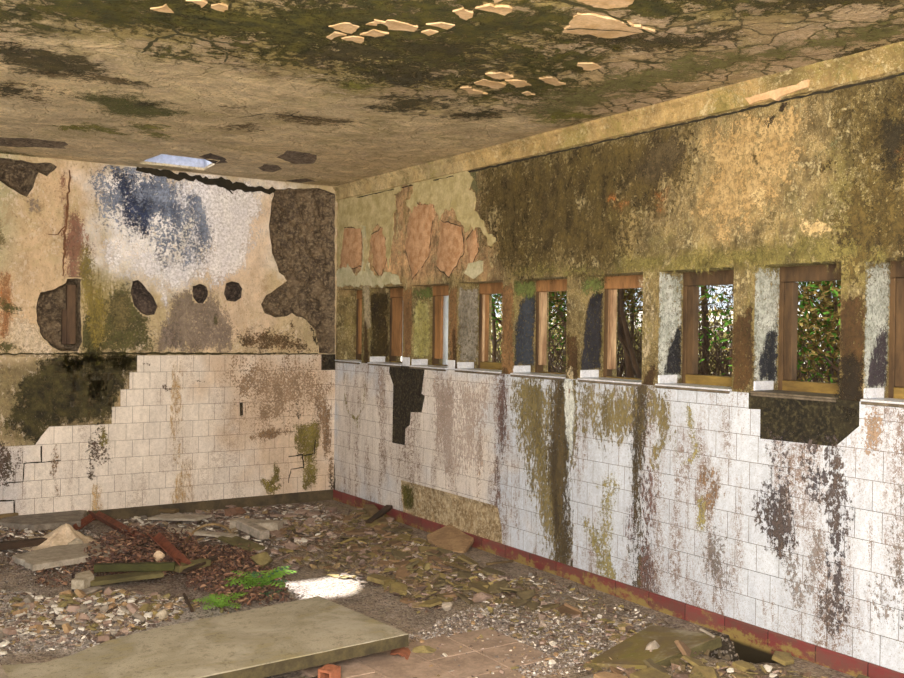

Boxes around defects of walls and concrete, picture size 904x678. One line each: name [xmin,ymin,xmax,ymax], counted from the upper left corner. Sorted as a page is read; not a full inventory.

peeling [326,0,512,43]
flaking render [0,158,57,197]
peeling [4,278,150,444]
damp [90,165,334,441]
flaking render [261,171,496,370]
peeling [389,366,425,445]
damp [427,102,814,593]
crack [357,72,904,198]
peeling [749,393,860,446]
damp [799,77,904,417]
damp [751,429,854,637]
damp [868,477,904,629]